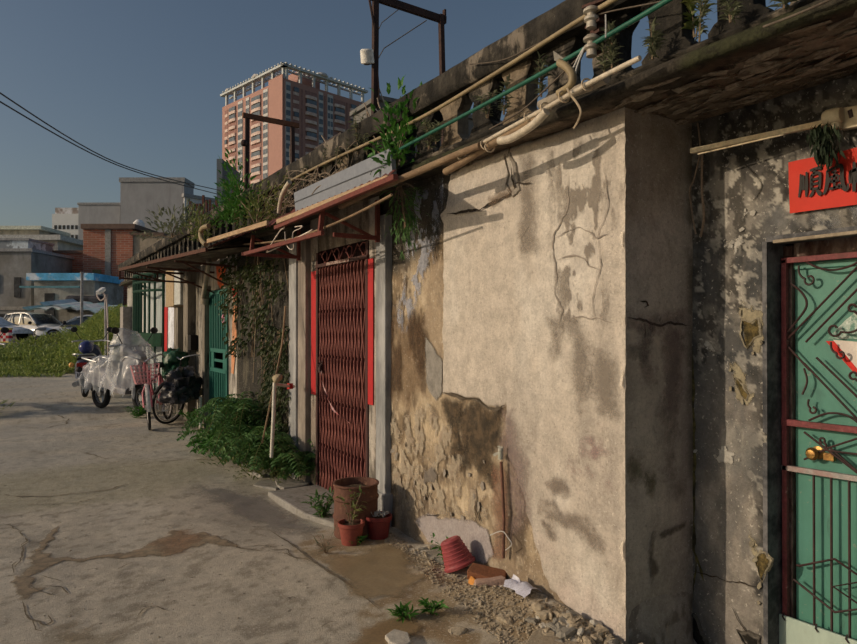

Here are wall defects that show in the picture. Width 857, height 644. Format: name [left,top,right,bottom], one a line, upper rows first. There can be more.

peeling [613,10,857,126]
crack [447,147,529,215]
leakage [491,160,533,251]
leakage [391,184,444,390]
leakage [551,150,614,413]
crack [628,301,688,336]
flaking render [390,404,487,520]
crack [12,527,59,572]
crack [242,530,381,611]
leakage [542,502,598,544]
spalling [748,535,774,590]
spalling [736,629,762,644]